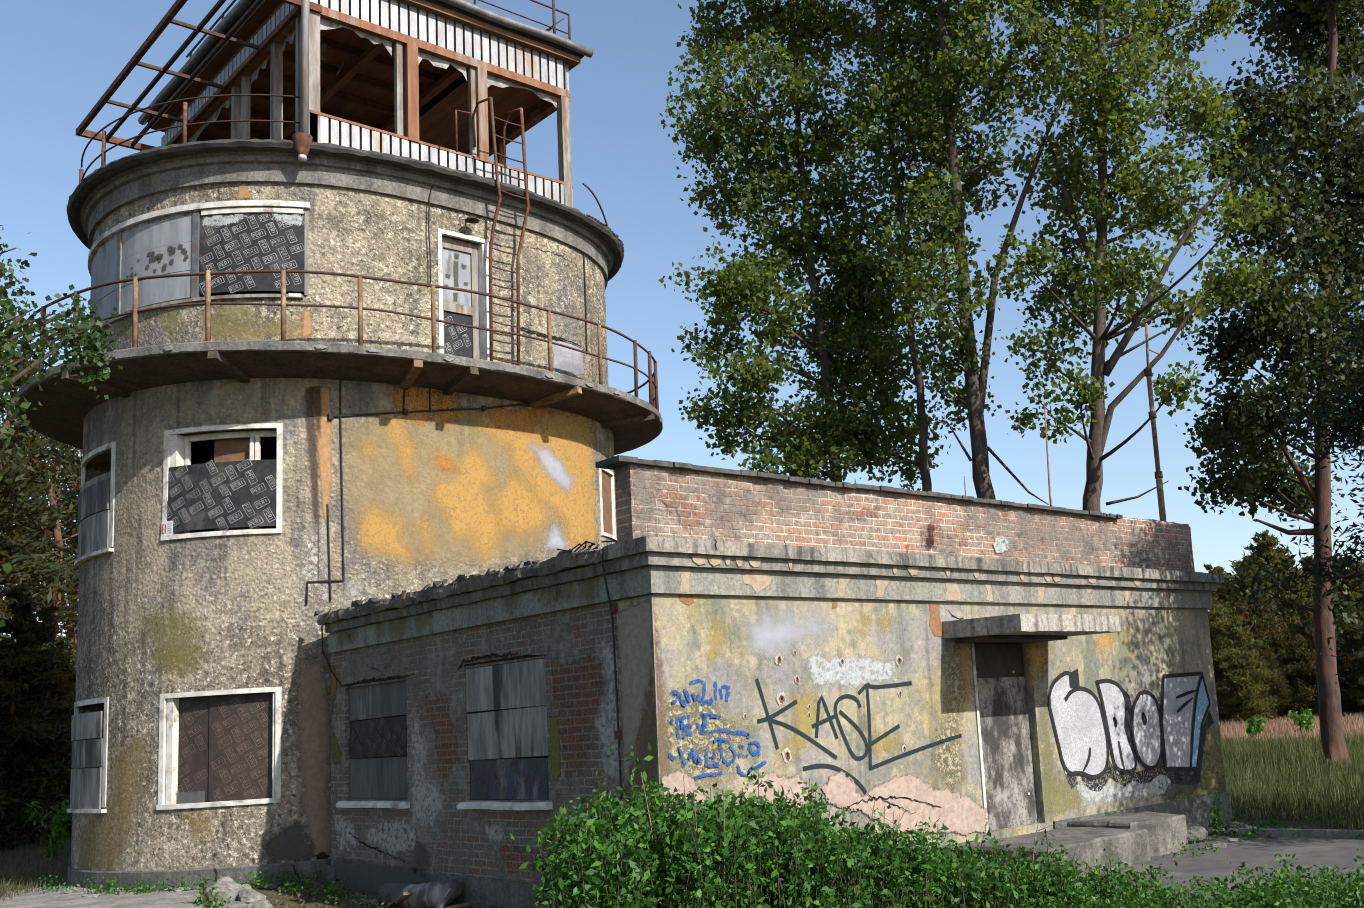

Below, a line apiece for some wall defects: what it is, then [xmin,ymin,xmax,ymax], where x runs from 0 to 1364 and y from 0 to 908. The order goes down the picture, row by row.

rust [237,183,252,198]
rust [303,311,312,337]
leakage [384,385,458,474]
leakage [434,406,596,559]
leakage [361,511,407,559]
peeling [678,555,772,606]
peeling [973,570,993,601]
peeling [1020,573,1061,602]
flaking render [659,566,988,836]
crack [843,794,940,815]